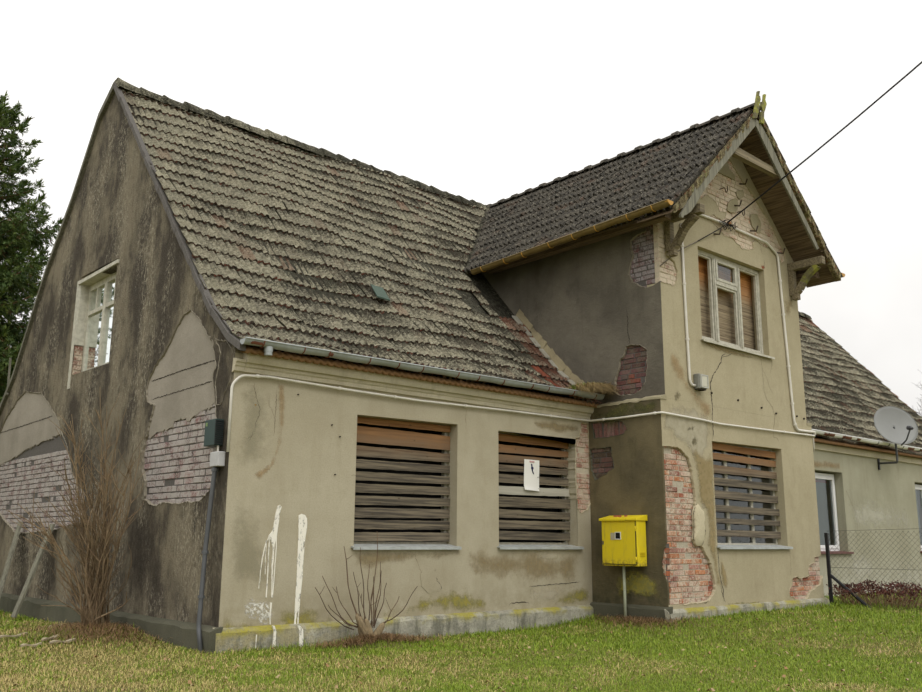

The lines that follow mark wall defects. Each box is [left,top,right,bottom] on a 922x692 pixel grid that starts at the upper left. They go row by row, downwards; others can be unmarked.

flaking render [628,222,678,289]
flaking render [700,159,786,266]
flaking render [141,309,234,507]
flaking render [613,344,648,396]
crack [710,353,731,440]
flaking render [0,391,85,534]
flaking render [575,420,627,513]
flaking render [662,446,716,606]
flaking render [789,556,823,600]